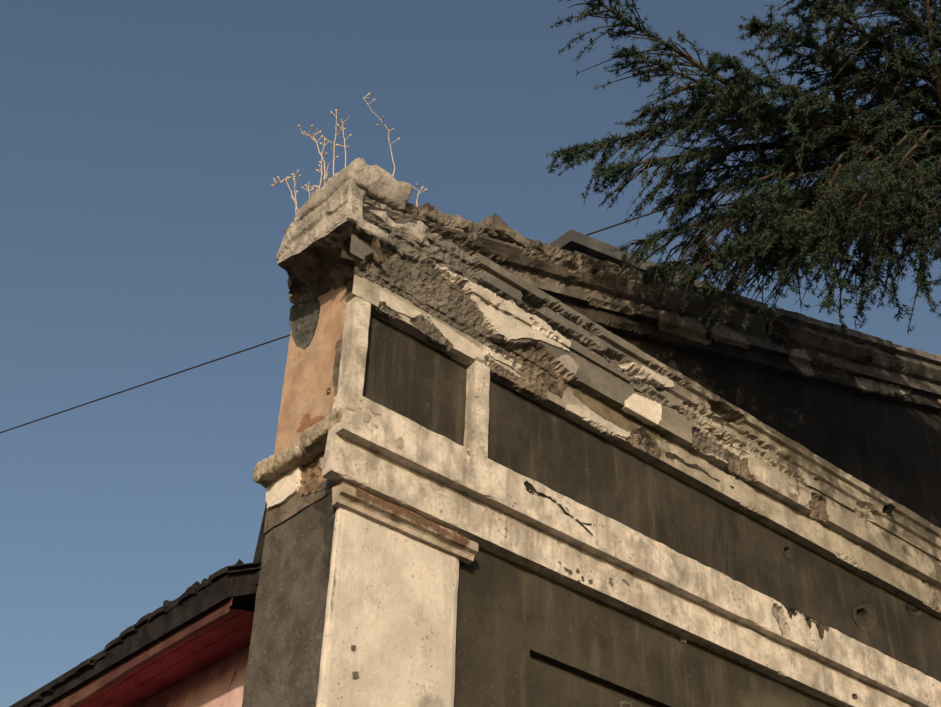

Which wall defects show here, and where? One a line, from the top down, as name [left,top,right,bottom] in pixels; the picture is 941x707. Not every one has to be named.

spalling [278,221,389,349]
flaking render [332,333,343,396]
peeling [297,414,324,432]
spalling [707,397,747,426]
crack [524,481,604,544]
spalling [772,603,829,639]